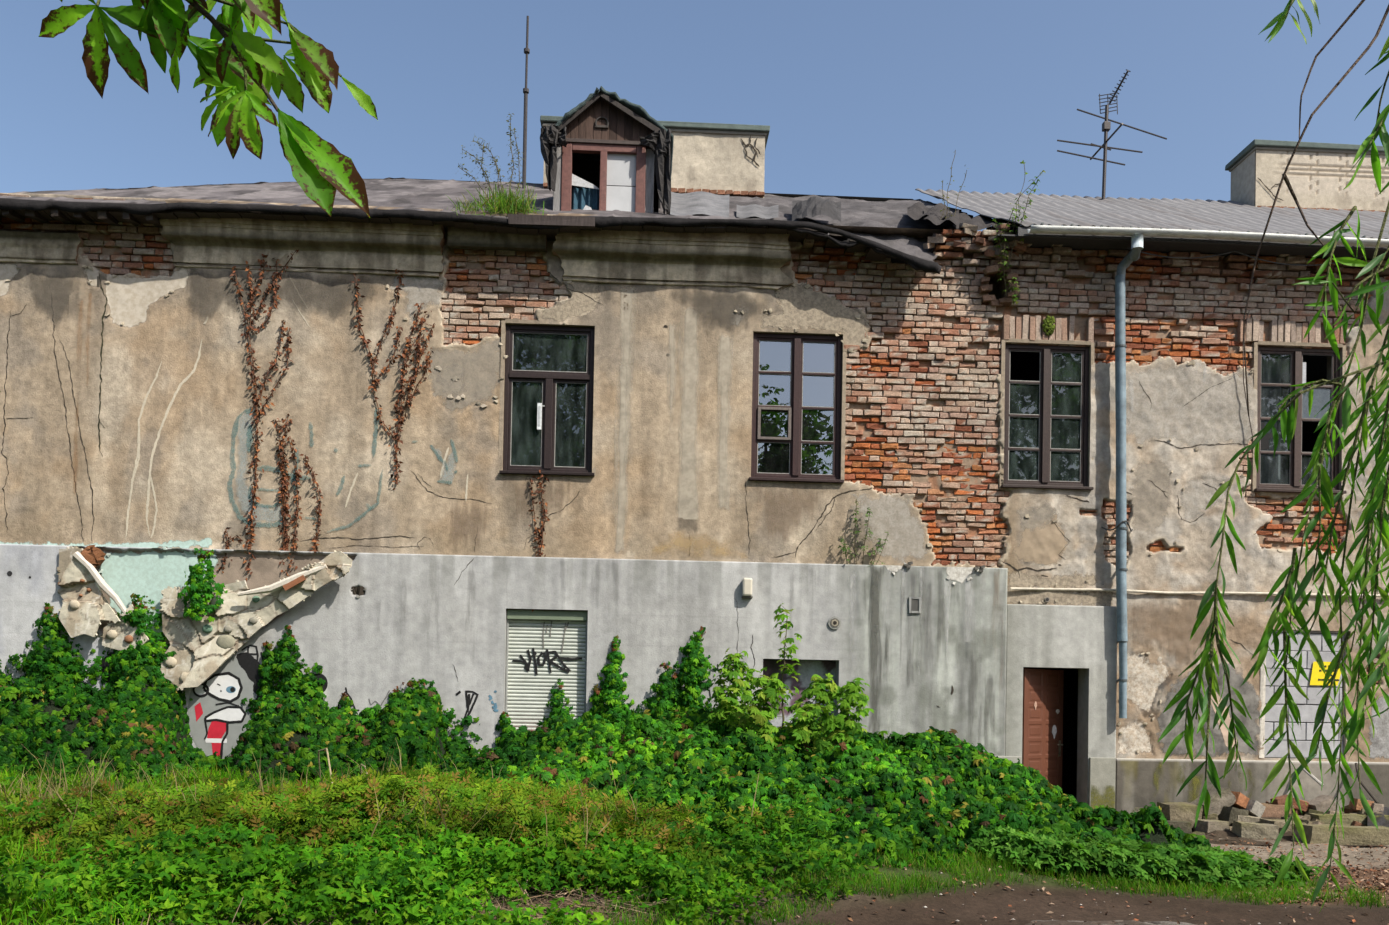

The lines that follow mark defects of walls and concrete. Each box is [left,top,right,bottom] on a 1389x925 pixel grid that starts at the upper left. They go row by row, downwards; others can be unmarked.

crack [1,273,108,538]
flaking render [0,210,188,328]
flaking render [386,249,600,411]
flaking render [761,223,1389,606]
peeling [0,538,218,634]
crack [745,480,887,558]
water stain [870,566,887,733]